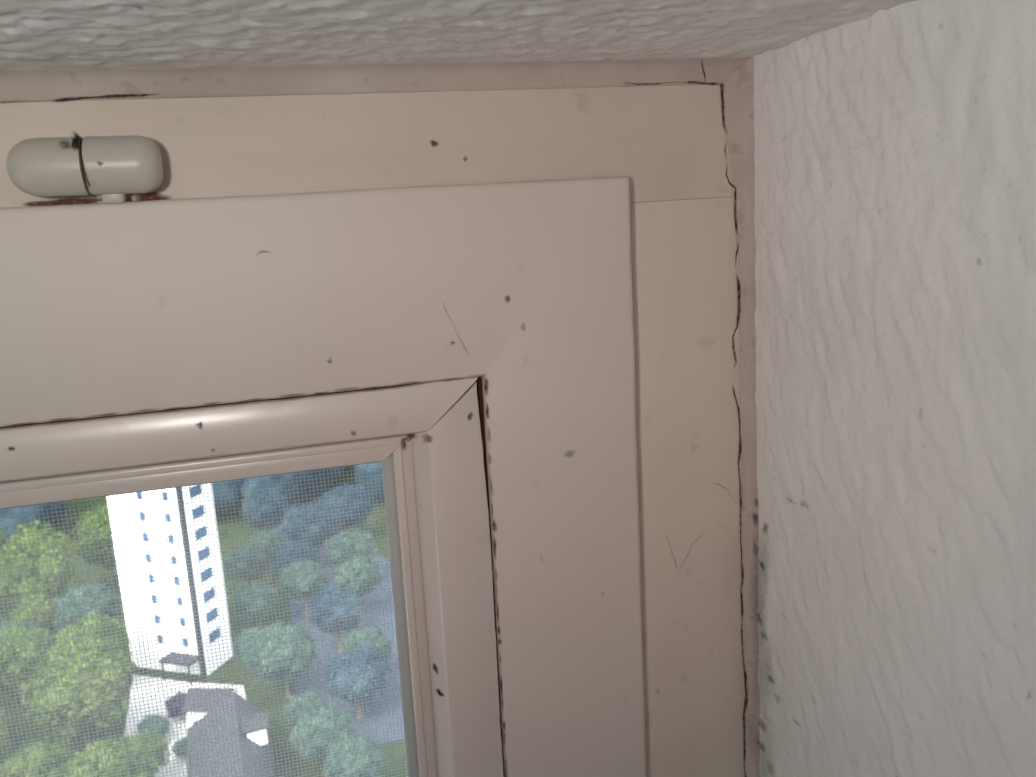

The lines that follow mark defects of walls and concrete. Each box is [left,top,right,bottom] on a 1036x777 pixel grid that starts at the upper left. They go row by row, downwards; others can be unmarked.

crack [631,64,741,361]
crack [733,387,748,777]